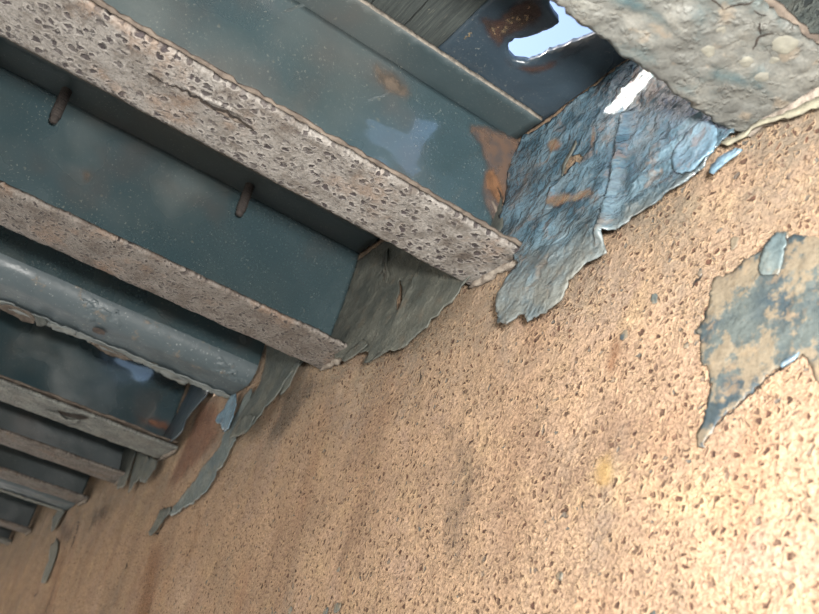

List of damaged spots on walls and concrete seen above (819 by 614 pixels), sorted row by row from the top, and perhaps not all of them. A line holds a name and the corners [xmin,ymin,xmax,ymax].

crack [148,73,254,131]
corrosion [92,0,522,246]
corrosion [484,1,541,42]
peeling [491,60,819,325]
peeling [0,304,77,336]
peeling [331,241,470,363]
peeling [695,231,819,448]
peeling [148,345,303,536]